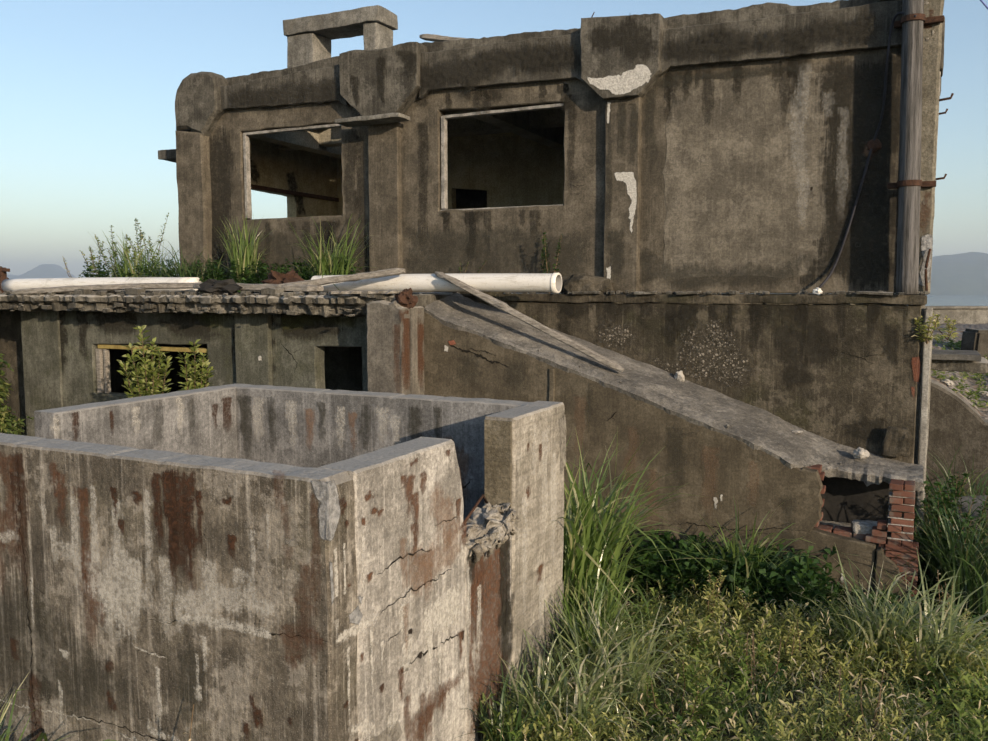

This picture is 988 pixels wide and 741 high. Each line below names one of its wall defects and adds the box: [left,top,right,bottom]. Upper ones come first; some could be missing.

leakage [398,39,580,109]
peeling [587,64,652,123]
leakage [590,11,879,215]
peeling [614,172,637,233]
leakage [800,51,901,291]
rust [50,463,105,626]
rust [133,469,204,585]
spalling [311,480,349,541]
crack [379,517,457,574]
crack [381,569,452,613]
crack [400,634,458,692]
rust [399,546,509,741]